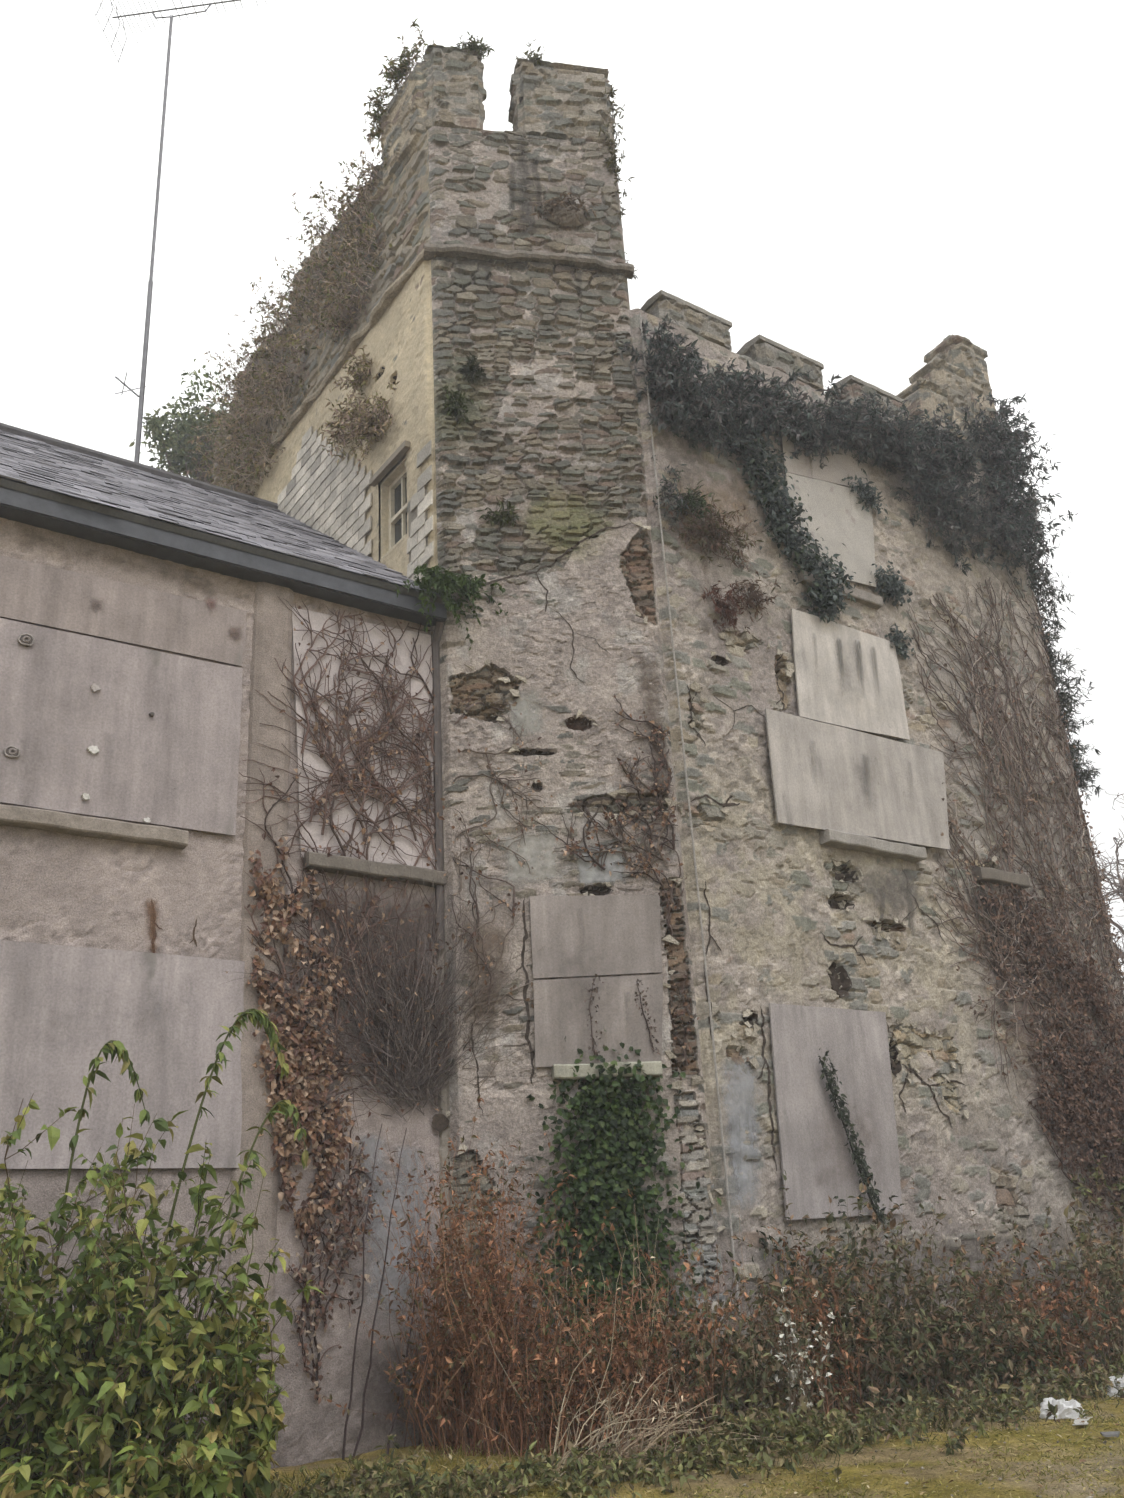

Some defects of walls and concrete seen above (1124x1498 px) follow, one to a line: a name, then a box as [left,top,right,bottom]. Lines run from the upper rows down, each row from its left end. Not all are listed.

spalling [621,521,656,625]
spalling [450,659,526,722]
spalling [661,877,726,1326]
damp [362,1137,427,1314]